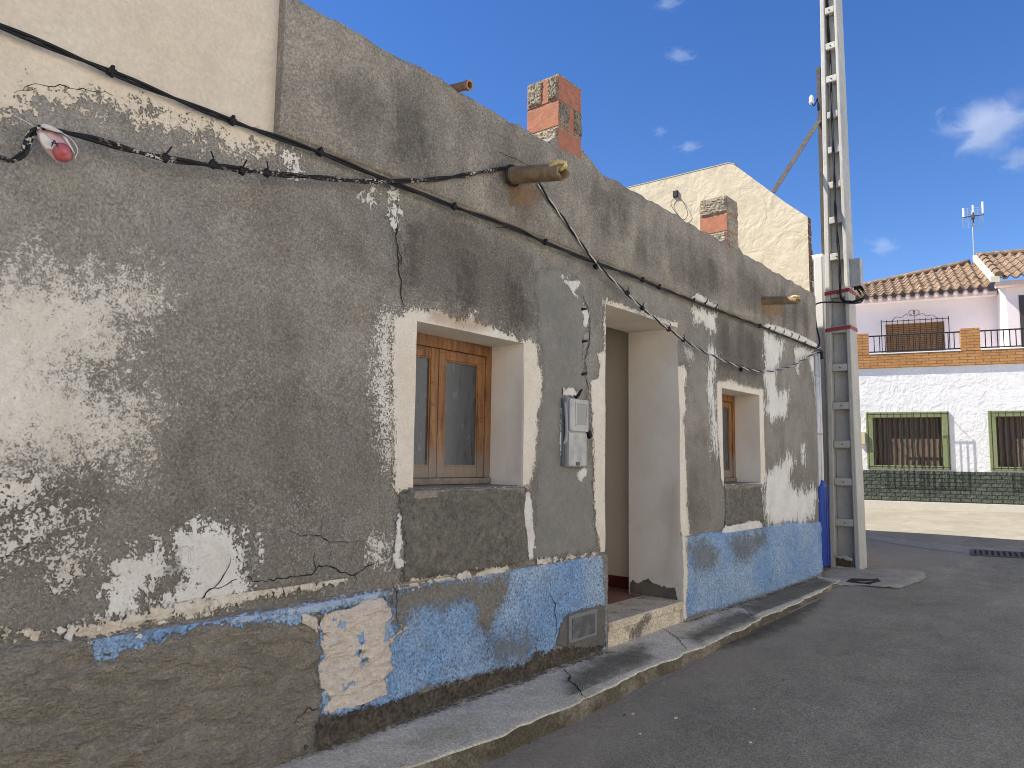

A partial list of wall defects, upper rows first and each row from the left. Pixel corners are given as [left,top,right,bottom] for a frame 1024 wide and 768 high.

crack [395,188,404,307]
peeling [762,323,817,424]
peeling [0,227,606,751]
peeling [685,441,819,575]
crack [202,521,398,622]